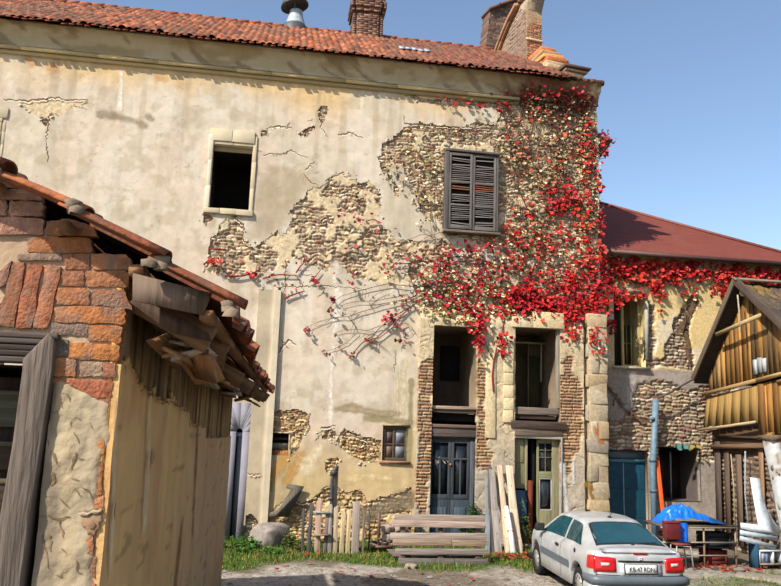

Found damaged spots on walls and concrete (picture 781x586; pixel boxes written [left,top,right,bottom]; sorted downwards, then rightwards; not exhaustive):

crack [4,97,88,162]
crack [269,120,363,139]
crack [257,149,318,186]
spalling [202,95,602,345]
spalling [273,409,381,475]
spalling [245,514,258,539]
spalling [268,487,412,541]